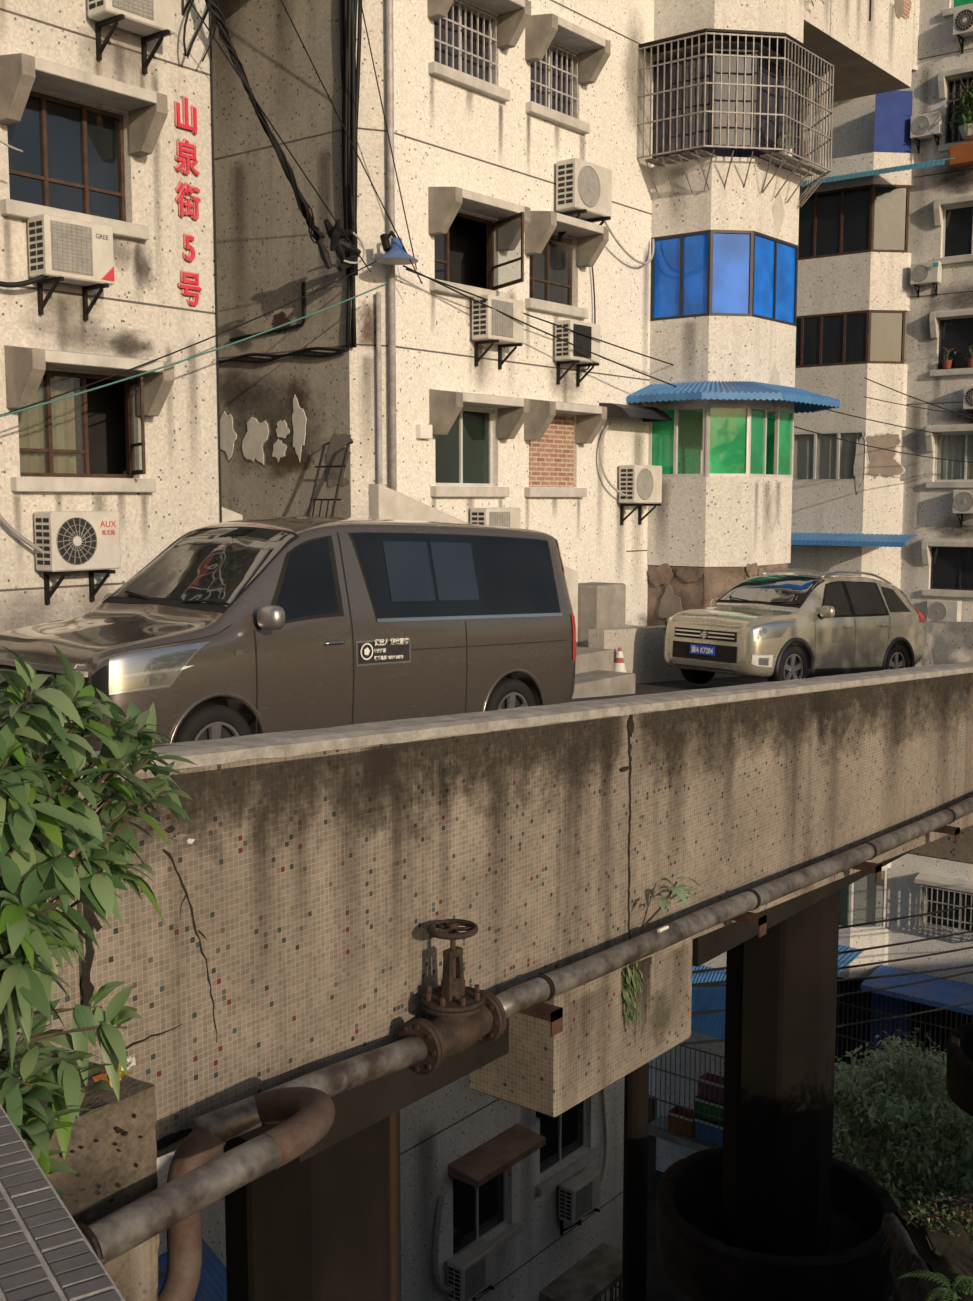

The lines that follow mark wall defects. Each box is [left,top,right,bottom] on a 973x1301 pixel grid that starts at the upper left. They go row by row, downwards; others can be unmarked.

flaking render [893,0,911,19]
peeling [220,392,308,468]
water stain [243,385,306,472]
flaking render [853,432,905,495]
water stain [641,673,973,773]
water stain [111,716,620,840]
crack [625,721,633,977]
crack [163,849,218,1036]
crack [126,1024,182,1049]